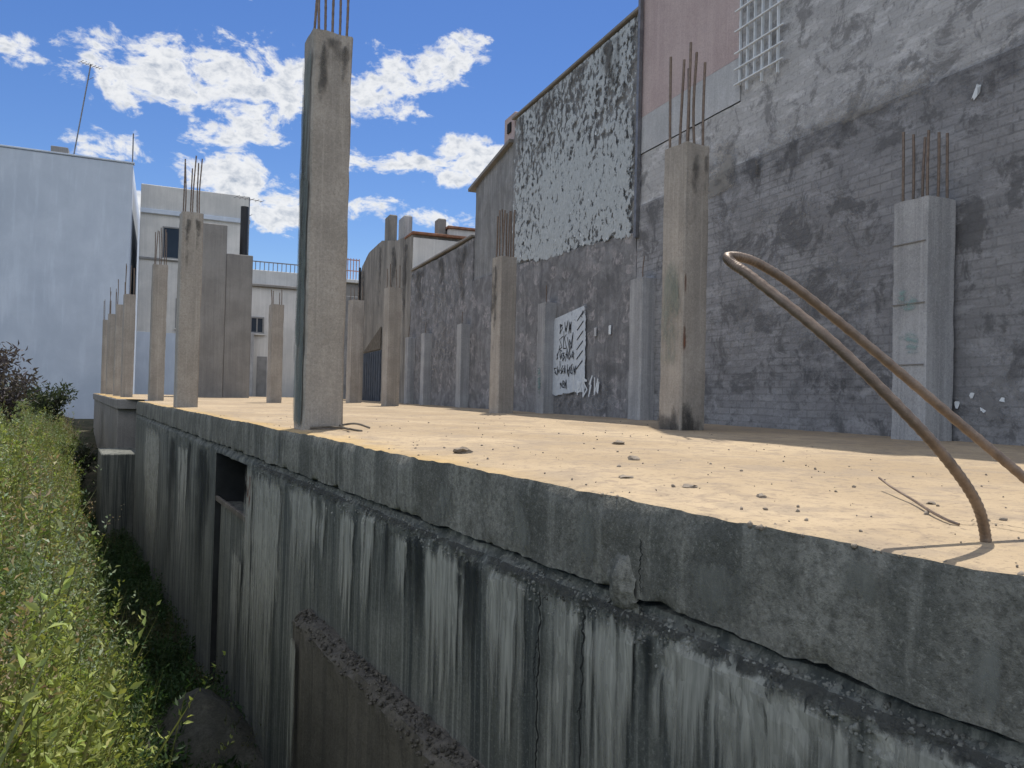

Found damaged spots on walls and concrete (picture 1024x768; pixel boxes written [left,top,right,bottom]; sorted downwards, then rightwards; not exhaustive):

peeling [496,18,638,263]
damp [142,428,209,586]
crack [533,592,542,768]
damp [228,464,1021,768]